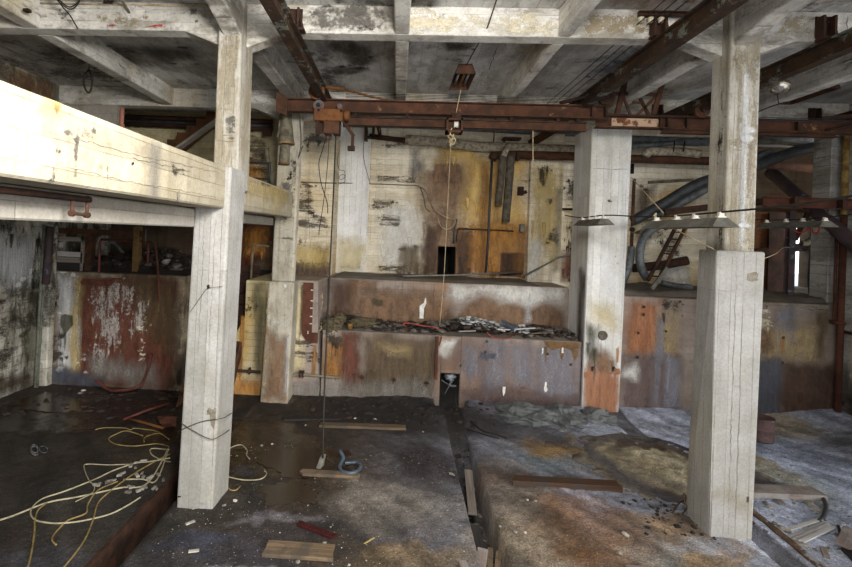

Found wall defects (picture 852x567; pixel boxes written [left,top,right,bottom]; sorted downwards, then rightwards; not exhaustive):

damp [310,41,373,87]
damp [310,0,386,31]
damp [0,223,40,395]
peeling [81,274,152,378]
damp [249,130,327,229]
damp [282,237,329,275]
damp [246,286,577,406]
damp [352,151,574,332]
corrosion [433,147,526,278]
corrosion [562,253,585,341]
corrosion [580,348,620,412]
corrosion [628,302,676,359]